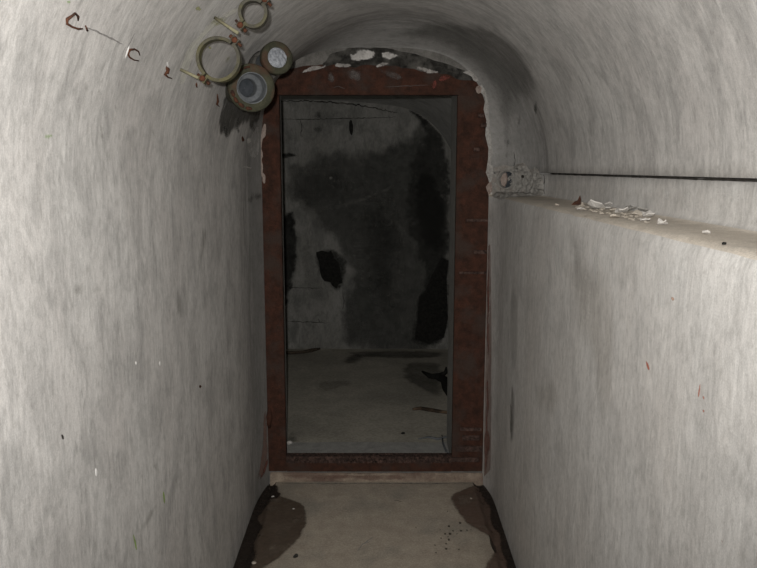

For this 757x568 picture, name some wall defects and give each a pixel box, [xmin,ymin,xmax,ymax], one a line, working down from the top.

damp [220,98,260,135]
spalling [303,47,493,195]
damp [283,213,296,304]
damp [293,111,450,349]
corrosion [286,453,452,463]
damp [233,485,306,568]
damp [435,485,516,568]